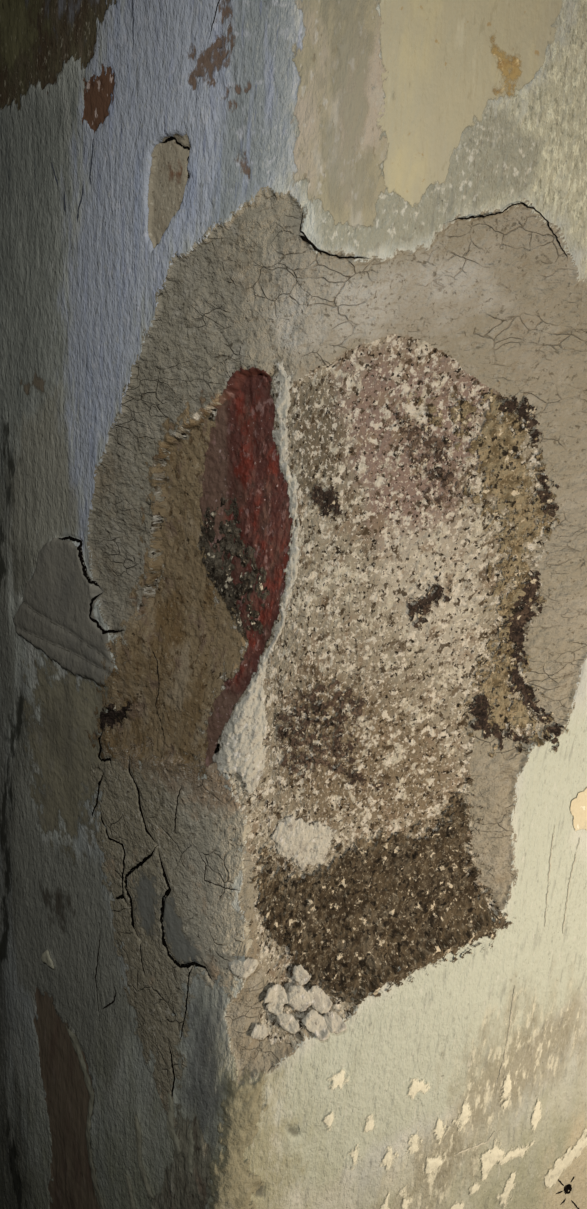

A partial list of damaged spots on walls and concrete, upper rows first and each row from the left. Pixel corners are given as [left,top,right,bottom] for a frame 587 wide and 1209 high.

peeling [0,0,116,221]
peeling [188,0,251,112]
peeling [291,0,562,229]
spalling [148,134,191,248]
crack [58,536,123,634]
spalling [23,186,587,1085]
crack [152,651,165,739]
crack [92,733,240,1097]
leakage [247,778,514,1018]
peeling [380,1098,472,1175]
peeling [451,1099,541,1209]
peeling [544,1128,587,1189]